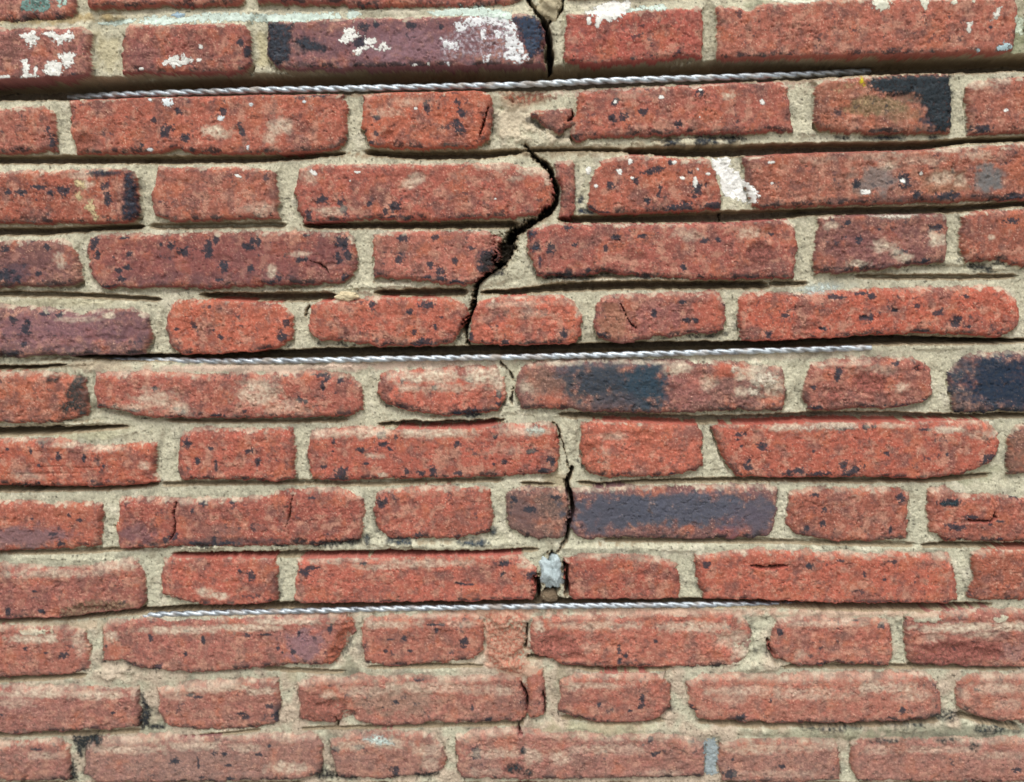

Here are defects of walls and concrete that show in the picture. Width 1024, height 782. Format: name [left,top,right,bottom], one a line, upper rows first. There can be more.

crack [526,0,565,78]
crack [479,106,489,137]
crack [461,143,560,346]
crack [500,360,515,404]
crack [531,422,575,603]